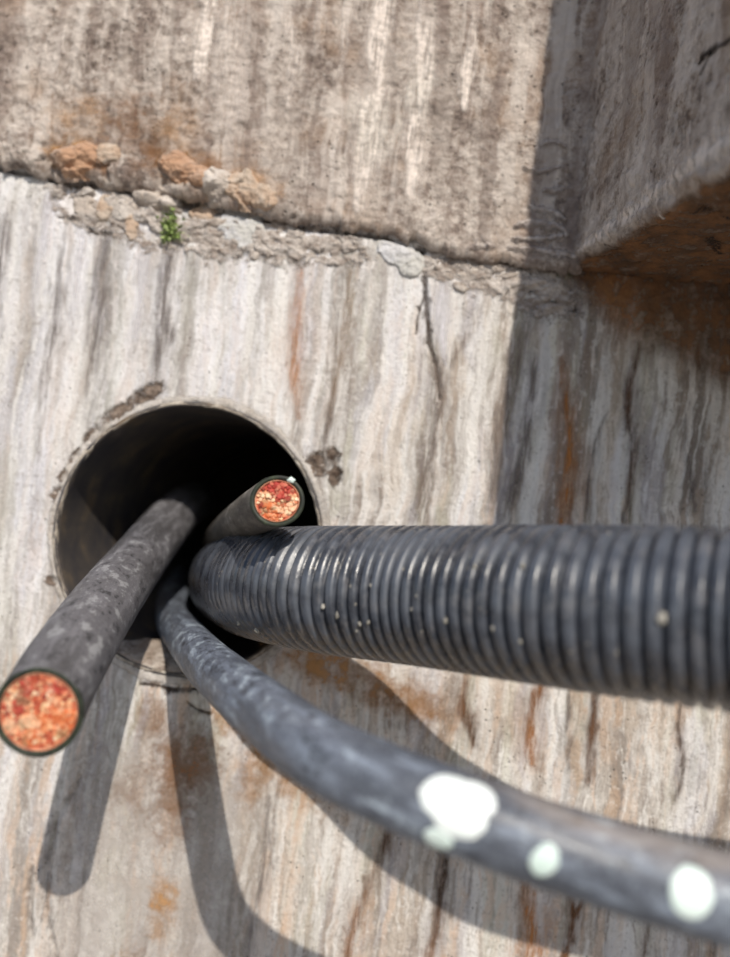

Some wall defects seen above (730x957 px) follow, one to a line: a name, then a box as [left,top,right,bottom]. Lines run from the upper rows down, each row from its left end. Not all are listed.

crack [0,169,99,189]
crack [182,202,225,218]
spalling [36,179,591,324]
crack [296,227,394,242]
crack [415,253,441,398]
spalling [49,380,165,502]
spalling [305,446,343,486]
rust [160,735,209,789]